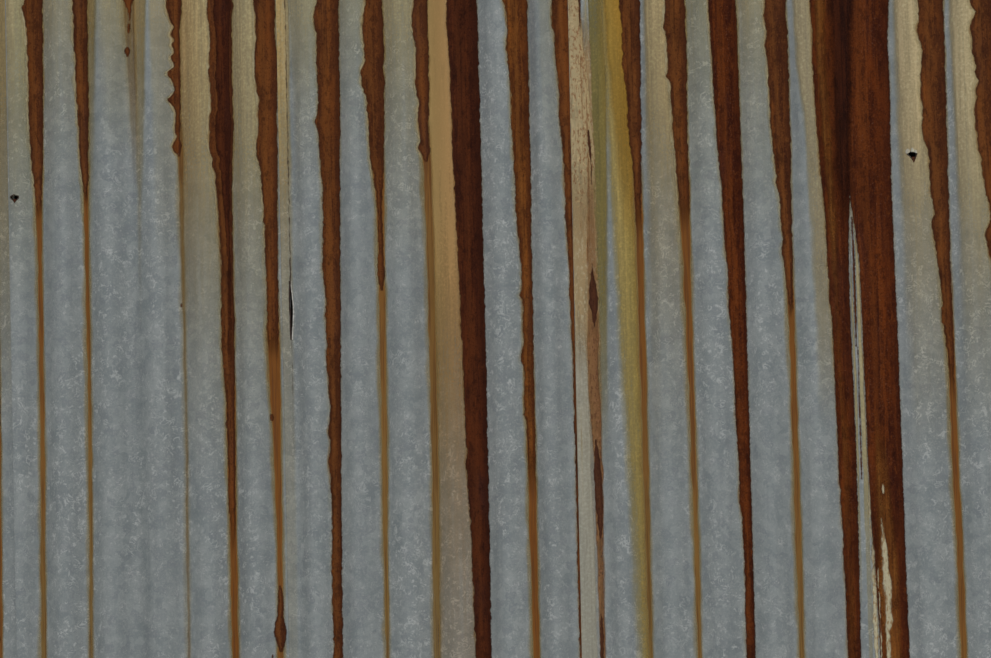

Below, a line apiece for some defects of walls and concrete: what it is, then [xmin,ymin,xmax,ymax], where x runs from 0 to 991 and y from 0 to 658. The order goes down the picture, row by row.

rust [21,0,46,658]
rust [206,0,239,658]
rust [252,0,287,658]
rust [313,0,343,658]
rust [359,0,389,658]
rust [409,0,492,658]
rust [503,0,540,658]
rust [619,0,653,658]
rust [707,0,756,658]
rust [810,0,910,658]
rust [915,0,967,658]
rust [968,0,991,257]